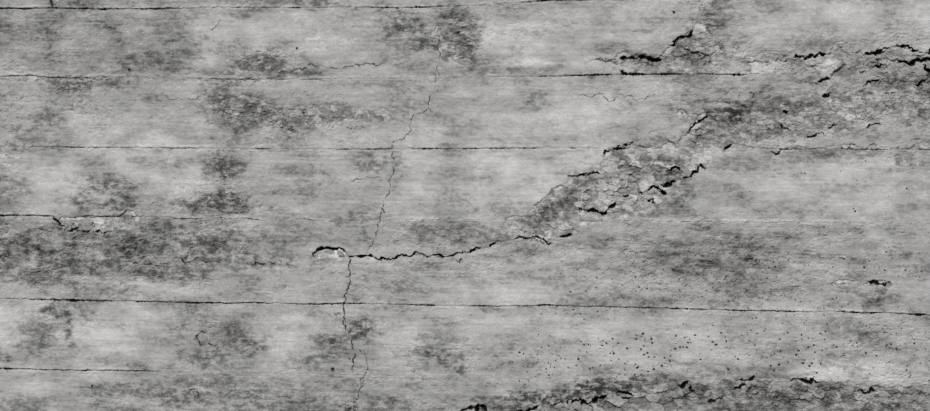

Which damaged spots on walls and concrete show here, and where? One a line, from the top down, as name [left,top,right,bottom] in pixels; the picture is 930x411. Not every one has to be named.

crack [266,60,410,73]
spalling [503,22,930,243]
crack [334,29,552,411]
spalling [832,254,906,289]
spalling [510,290,930,411]